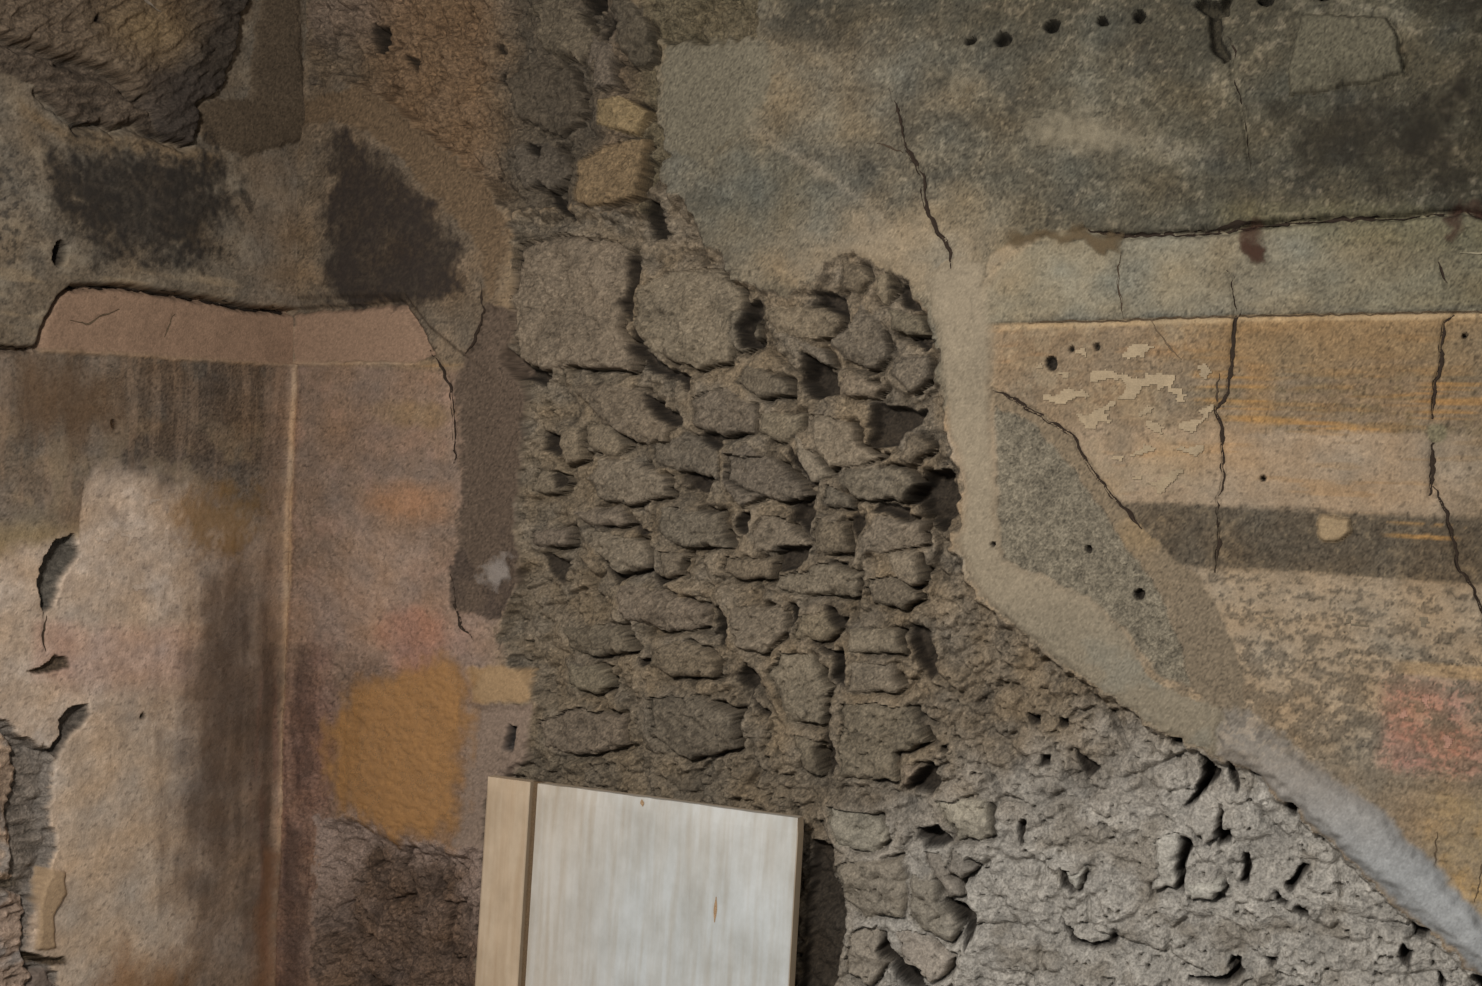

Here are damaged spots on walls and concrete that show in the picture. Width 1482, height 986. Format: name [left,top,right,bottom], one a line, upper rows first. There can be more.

crack [877,88,953,269]
spalling [36,533,79,610]
spalling [303,0,1482,986]
crack [993,390,1142,529]
crack [1033,209,1482,613]
spalling [26,653,69,674]
spalling [0,703,89,986]